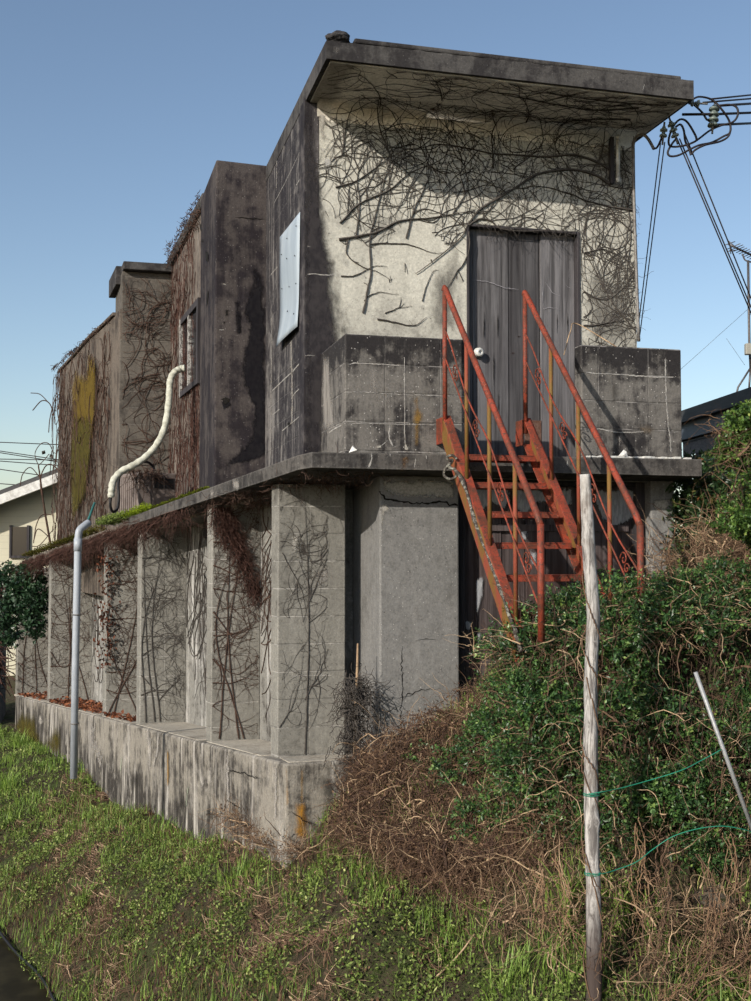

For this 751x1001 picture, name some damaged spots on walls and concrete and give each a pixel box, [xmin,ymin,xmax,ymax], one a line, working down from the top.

leakage [230,269,299,464]
crack [379,491,458,508]
crack [379,646,439,731]